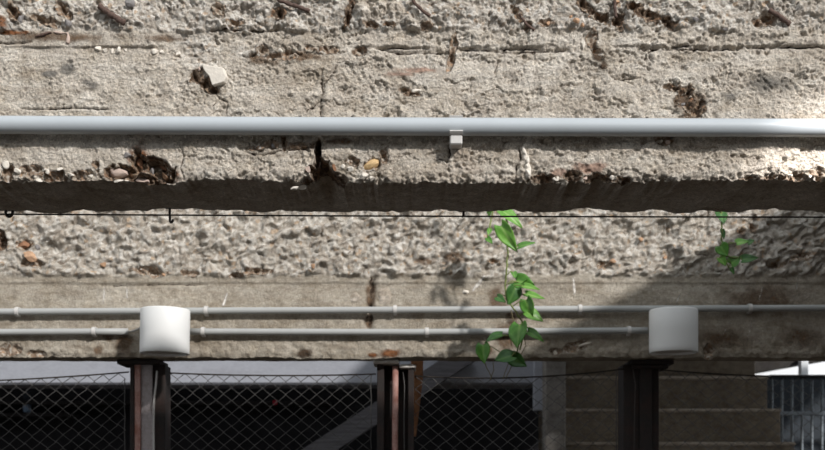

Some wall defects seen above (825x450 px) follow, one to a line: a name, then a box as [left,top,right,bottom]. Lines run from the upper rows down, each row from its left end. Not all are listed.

spalling [663,82,707,118]
spalling [1,148,178,186]
spalling [290,138,388,190]
spalling [526,170,631,186]
spalling [738,166,825,183]